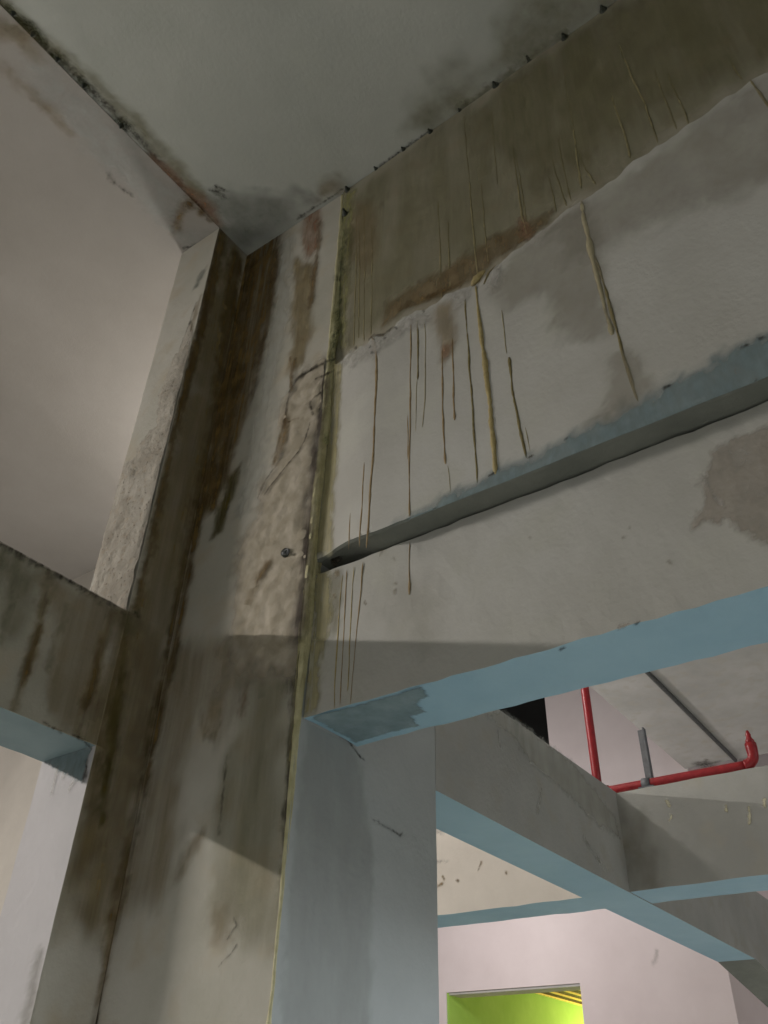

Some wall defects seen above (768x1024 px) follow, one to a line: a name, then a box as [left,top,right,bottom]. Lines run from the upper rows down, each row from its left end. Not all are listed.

leakage [5,7,66,65]
corrosion [290,211,319,387]
corrosion [382,217,547,325]
crack [257,356,335,499]
leakage [310,409,328,493]
leakage [84,186,286,927]
leakage [295,508,313,639]
leakage [282,720,294,835]